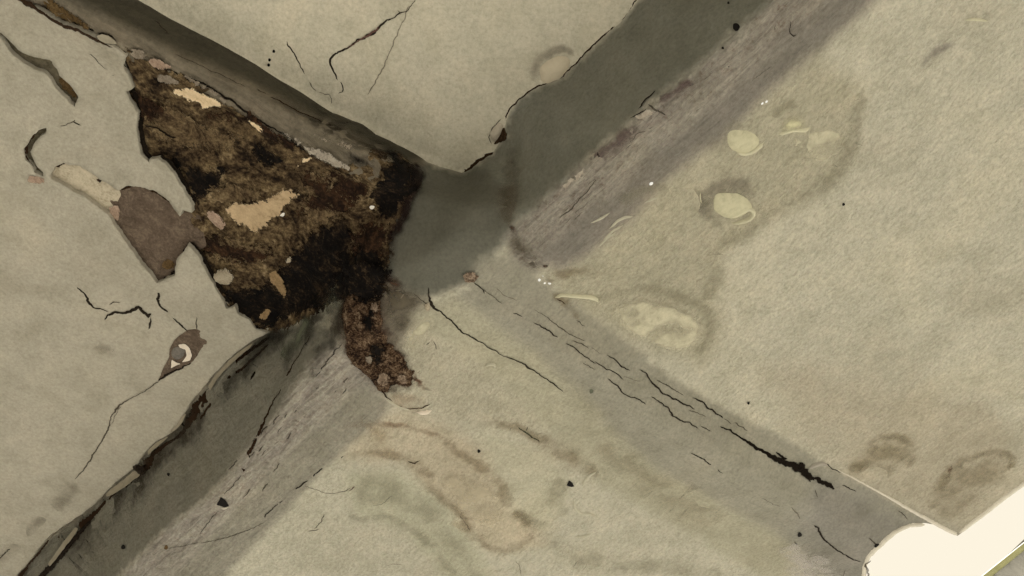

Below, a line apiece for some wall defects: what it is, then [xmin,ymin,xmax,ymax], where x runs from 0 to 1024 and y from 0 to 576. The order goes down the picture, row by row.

peeling [0,33,78,103]
crack [156,1,415,121]
crack [77,287,197,331]
spalling [18,0,419,576]
crack [415,288,562,391]
leakage [623,302,698,348]
crack [484,290,855,497]
spalling [836,469,1024,576]